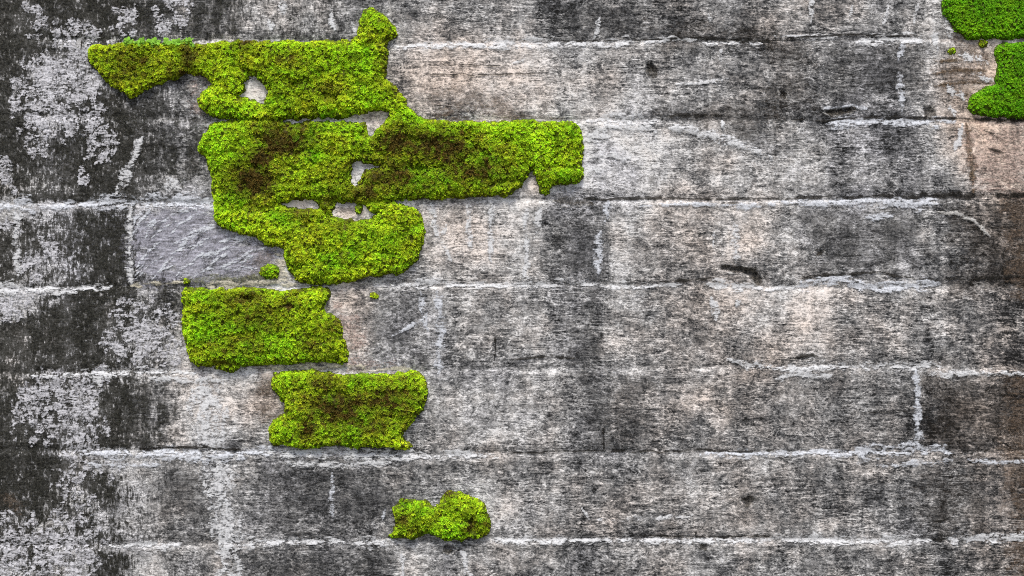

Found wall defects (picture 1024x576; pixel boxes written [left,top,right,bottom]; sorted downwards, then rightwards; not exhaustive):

damp [31,365,499,576]